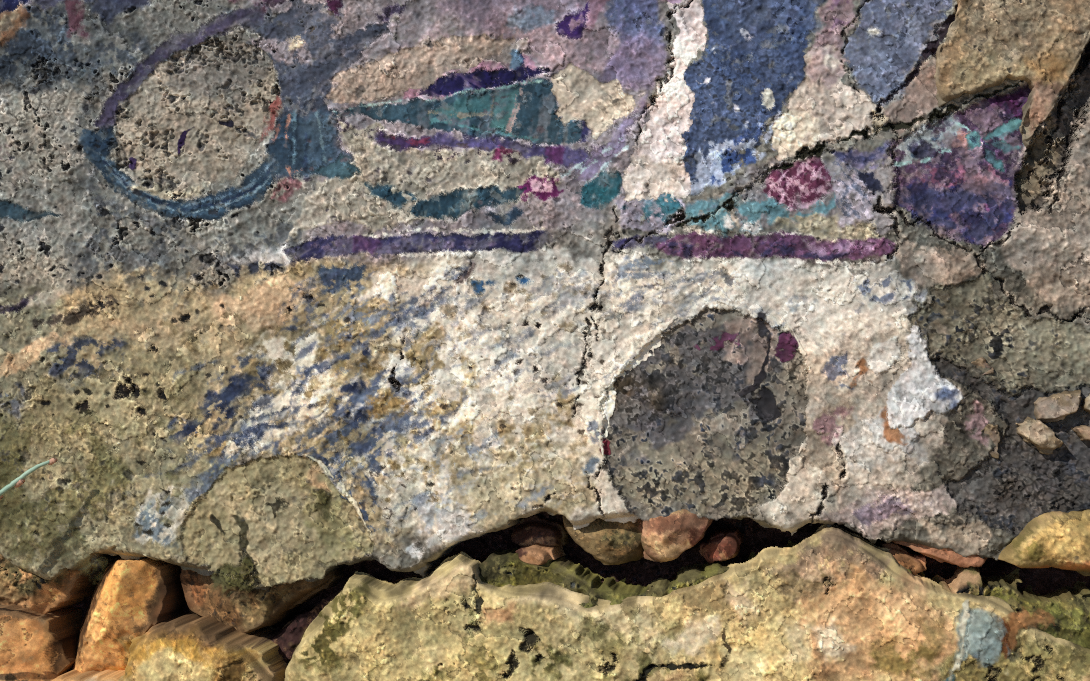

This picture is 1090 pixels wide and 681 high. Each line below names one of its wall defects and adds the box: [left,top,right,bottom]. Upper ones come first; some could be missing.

crack [573,0,1023,413]
crack [873,194,1088,322]
crack [1028,42,1090,213]
crack [636,616,734,681]